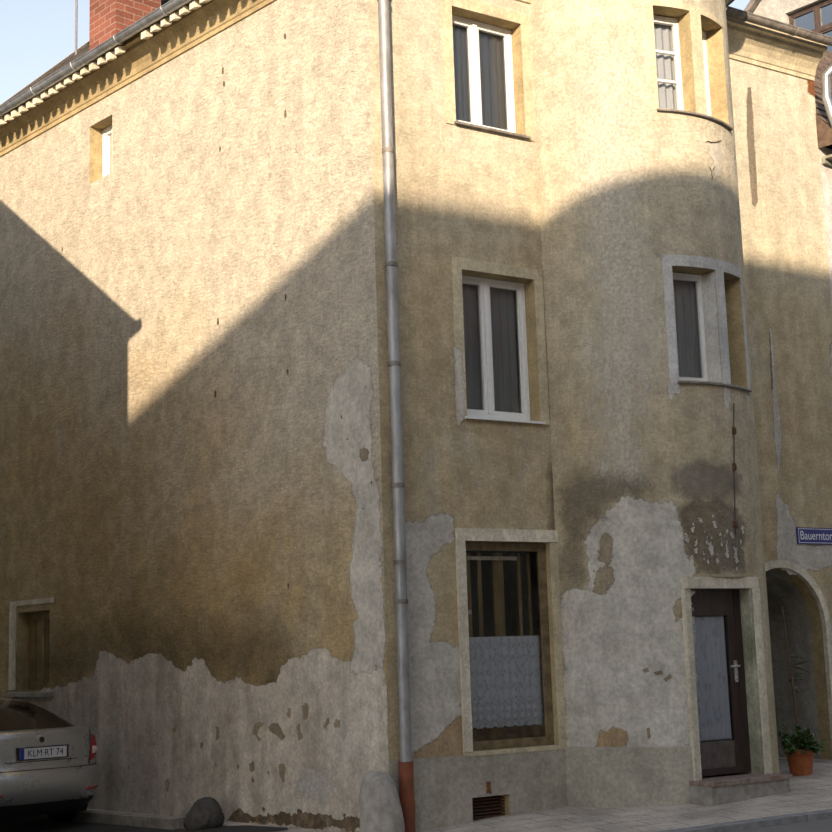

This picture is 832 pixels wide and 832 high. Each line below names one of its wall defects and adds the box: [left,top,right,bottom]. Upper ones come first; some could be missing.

peeling [684,510,753,571]
peeling [14,648,389,832]
peeling [414,717,463,759]